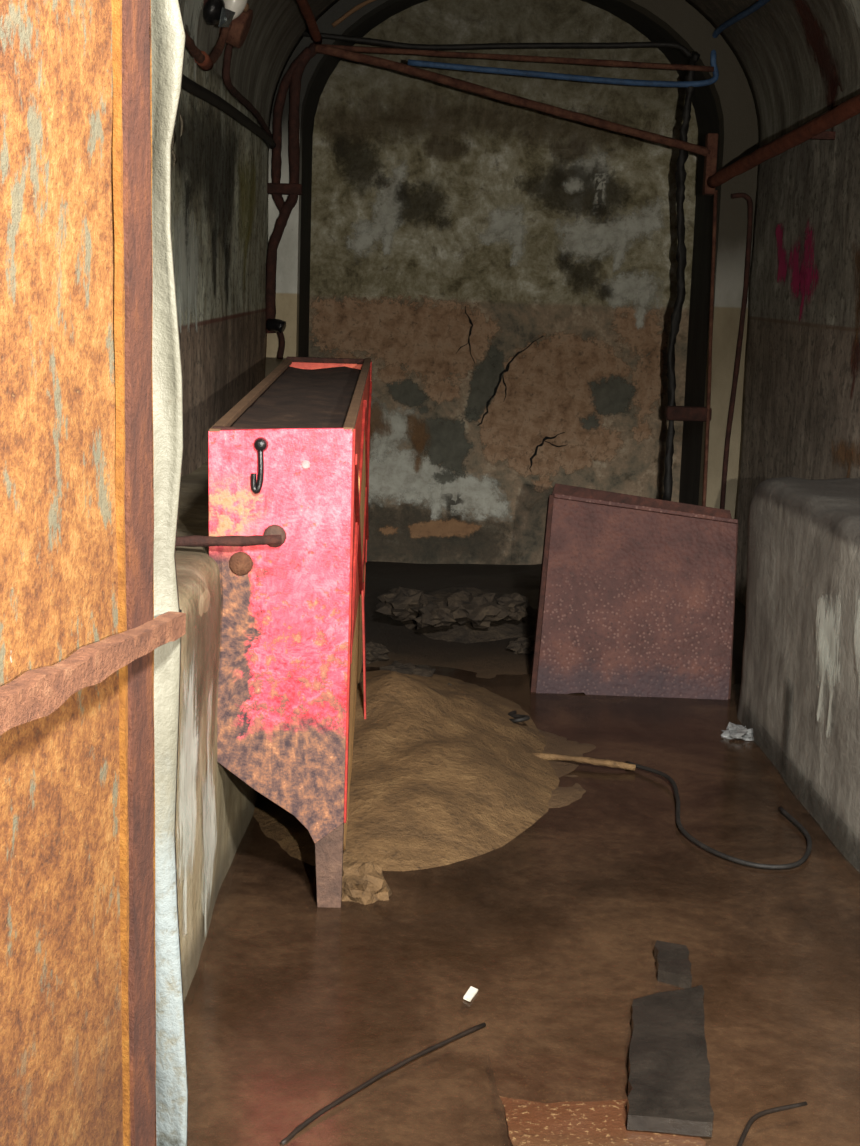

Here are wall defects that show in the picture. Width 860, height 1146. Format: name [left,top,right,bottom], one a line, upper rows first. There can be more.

water stain [174,102,237,330]
water stain [335,138,449,255]
water stain [480,207,524,265]
water stain [525,155,663,329]
flaking render [379,519,482,539]
water stain [367,401,509,564]
crack [456,306,475,363]
peeling [309,294,669,493]
crack [477,336,544,426]
crack [529,432,568,471]